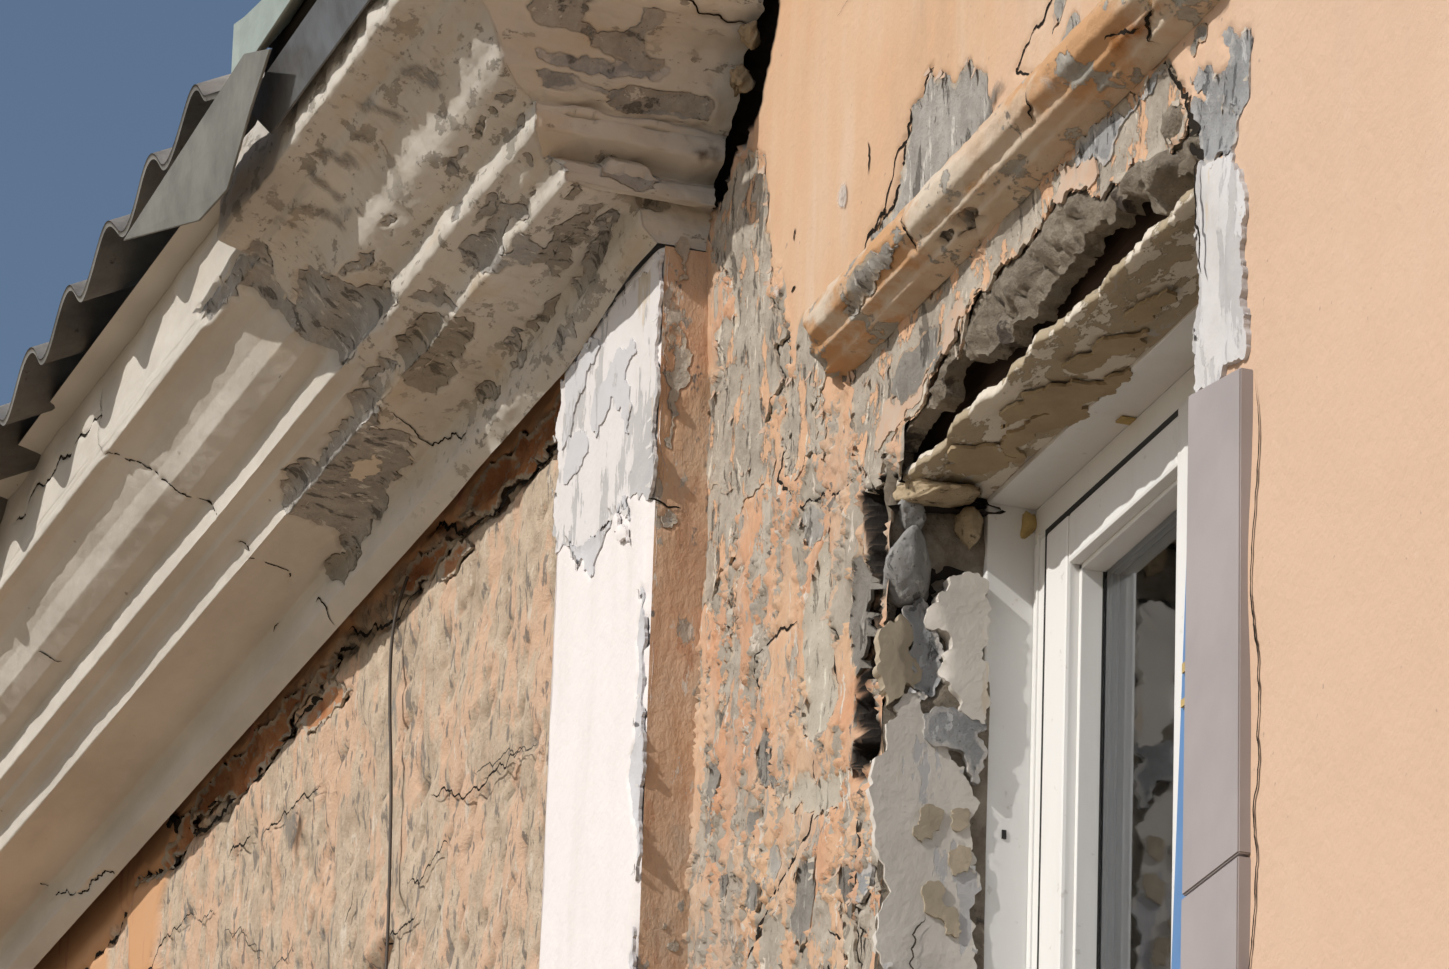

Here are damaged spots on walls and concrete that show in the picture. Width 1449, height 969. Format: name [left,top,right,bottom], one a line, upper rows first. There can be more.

peeling [527,0,715,122]
crack [688,0,779,203]
crack [1016,0,1052,119]
crack [16,390,217,521]
flaking render [201,240,474,585]
peeling [451,152,693,577]
peeling [702,23,1254,745]
crack [40,588,424,896]
crack [433,745,536,800]
peeling [902,598,988,786]
crack [1248,385,1260,969]
peeling [746,839,875,969]